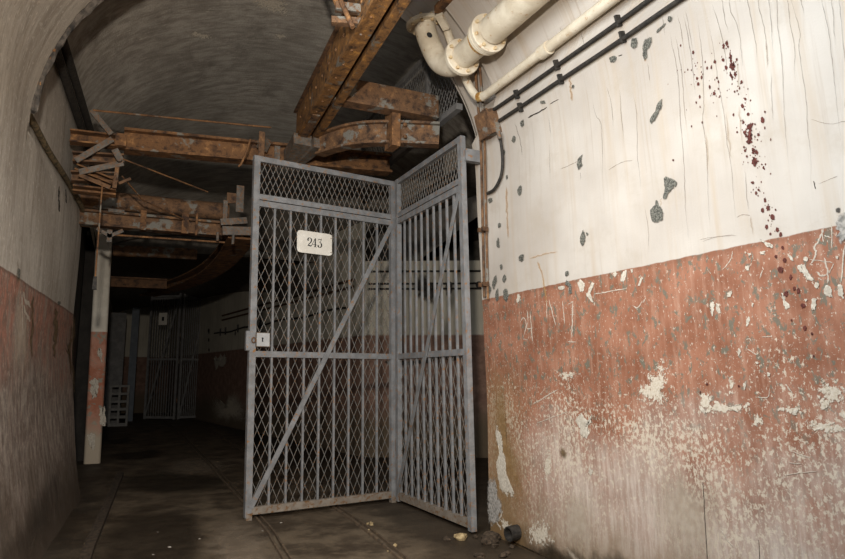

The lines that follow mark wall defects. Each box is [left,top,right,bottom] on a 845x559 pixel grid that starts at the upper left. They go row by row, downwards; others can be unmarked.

spalling [650,99,662,124]
spalling [650,177,677,222]
peeling [788,208,845,310]
peeling [89,377,99,399]
peeling [576,413,592,439]
peeling [699,396,750,414]
peeling [495,426,514,497]
damp [513,516,576,559]